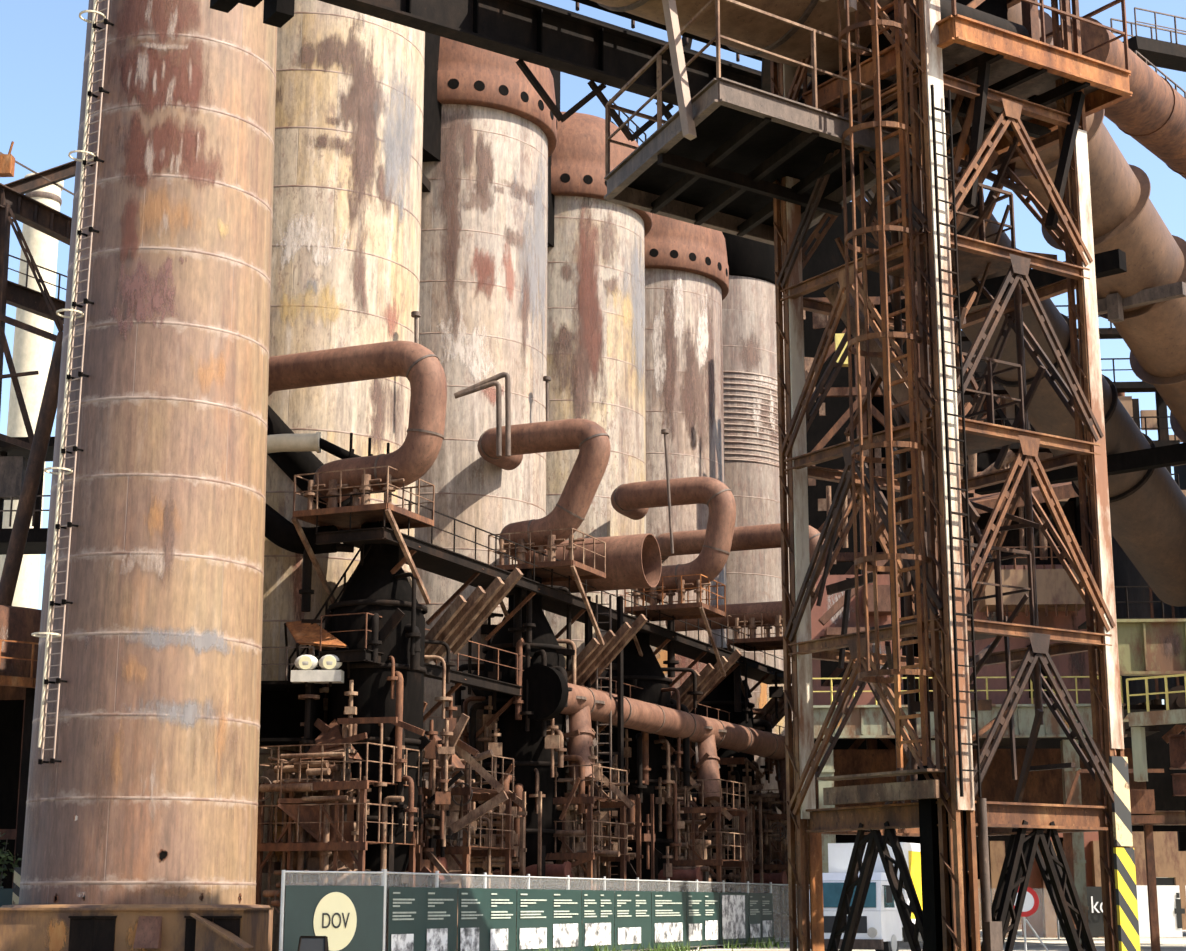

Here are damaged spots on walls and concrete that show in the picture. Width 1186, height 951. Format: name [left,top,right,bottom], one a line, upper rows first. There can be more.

rust [121,195,188,259]
rust [155,501,174,578]
rust [49,920,68,951]